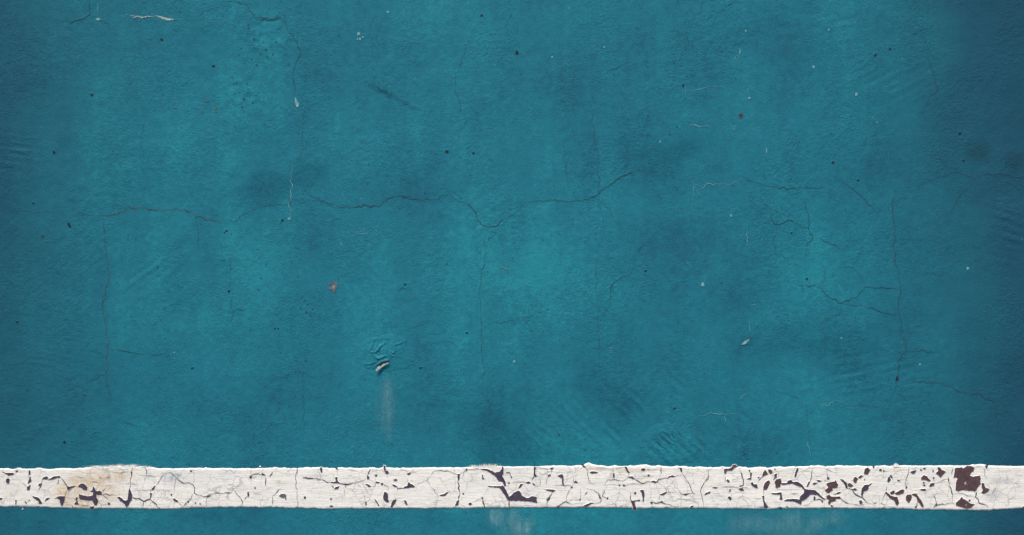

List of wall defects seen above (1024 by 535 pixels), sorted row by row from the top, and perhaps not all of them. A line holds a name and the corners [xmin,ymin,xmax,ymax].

crack [15,2,647,426]
crack [689,157,1021,461]
peeling [0,470,134,510]
peeling [302,465,434,508]
peeling [471,462,604,508]
peeling [613,489,645,511]
peeling [712,464,989,509]